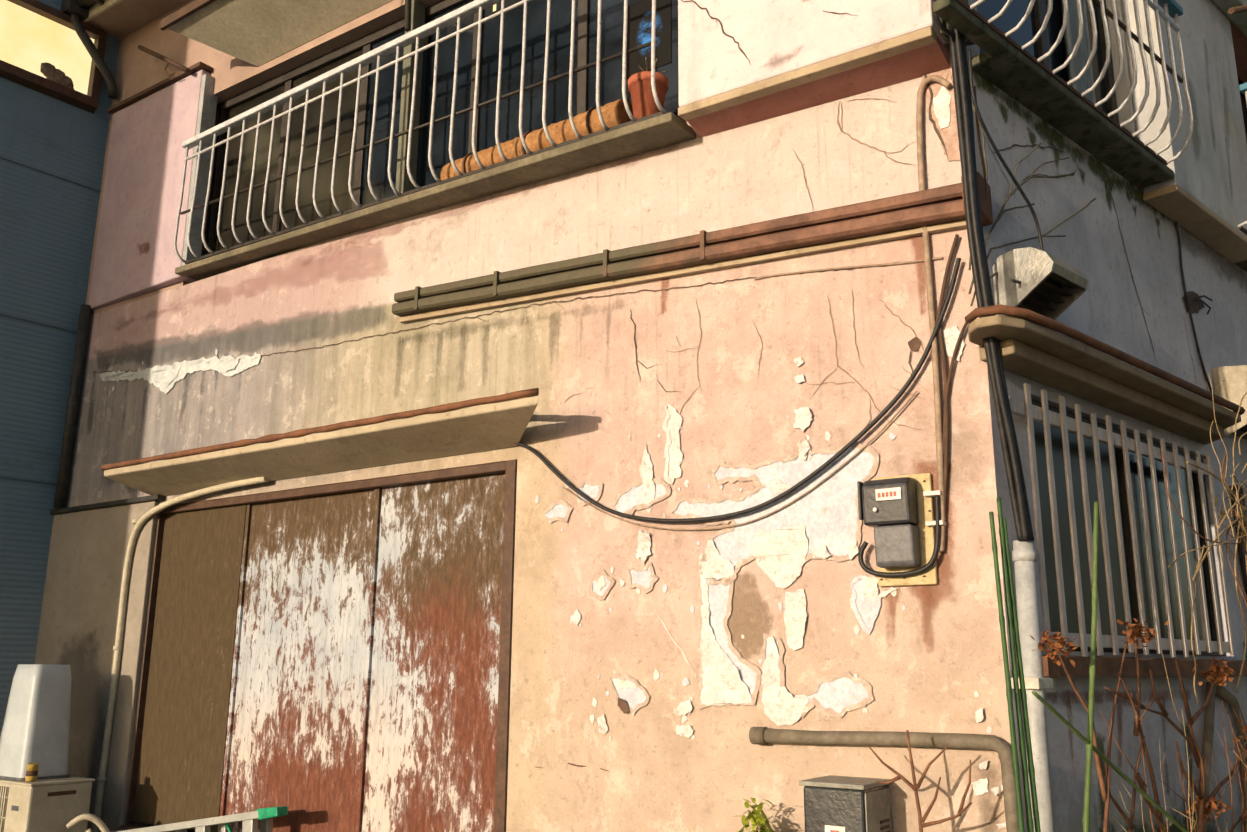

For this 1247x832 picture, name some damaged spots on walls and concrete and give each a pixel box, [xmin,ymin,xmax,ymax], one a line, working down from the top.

crack [681,0,750,63]
crack [837,98,916,165]
crack [792,149,813,209]
peeling [100,349,261,394]
crack [261,262,928,430]
peeling [793,356,805,383]
peeling [535,404,879,741]
peeling [850,574,906,635]
peeling [974,691,992,734]
peeling [967,760,1003,797]
water stain [1097,736,1105,832]